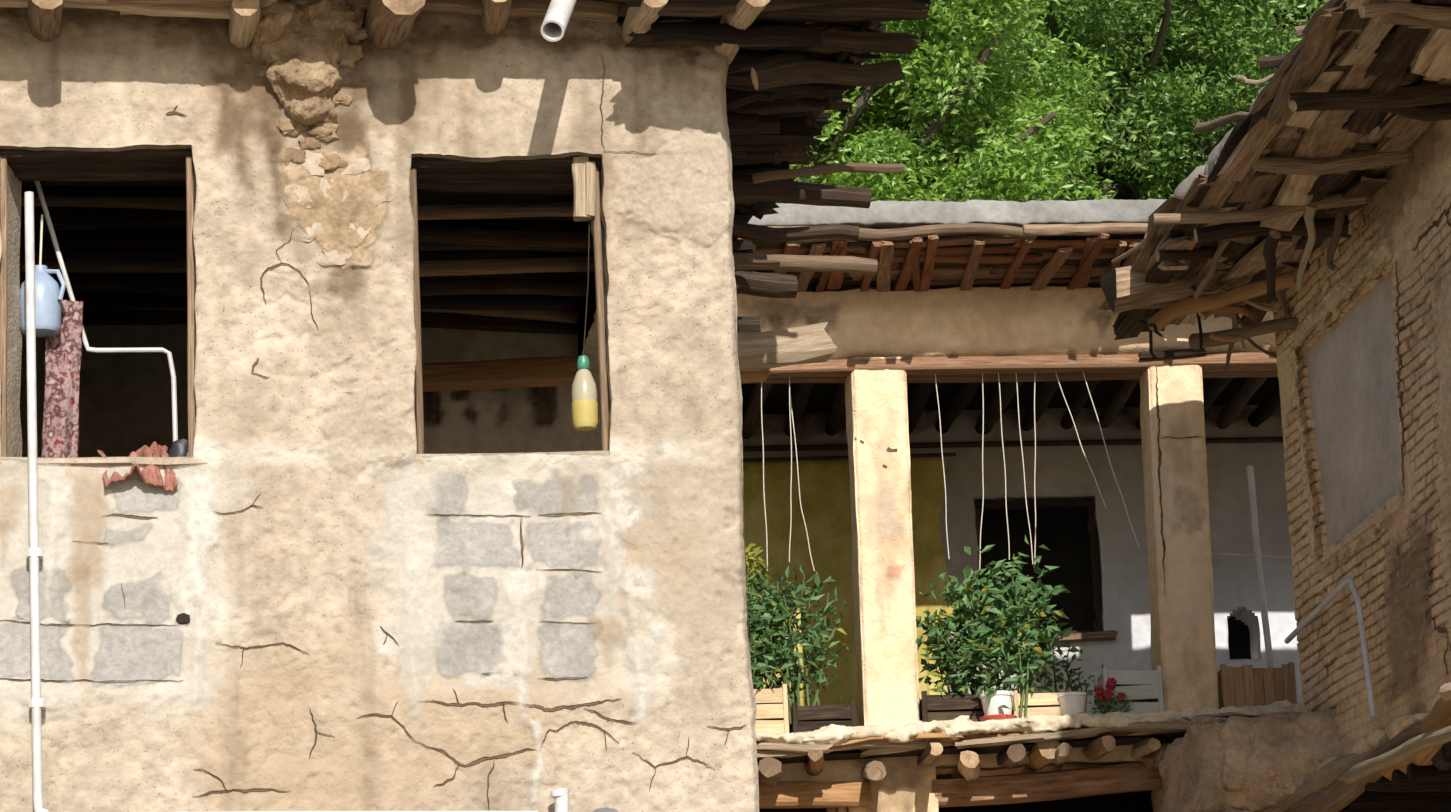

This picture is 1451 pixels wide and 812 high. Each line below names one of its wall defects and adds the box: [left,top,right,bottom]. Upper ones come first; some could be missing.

peeling [337,27,368,69]
flaking render [276,90,395,269]
crack [260,228,318,328]
crack [1395,203,1451,496]
crack [218,642,303,665]
crack [194,769,291,797]
crack [309,671,746,807]